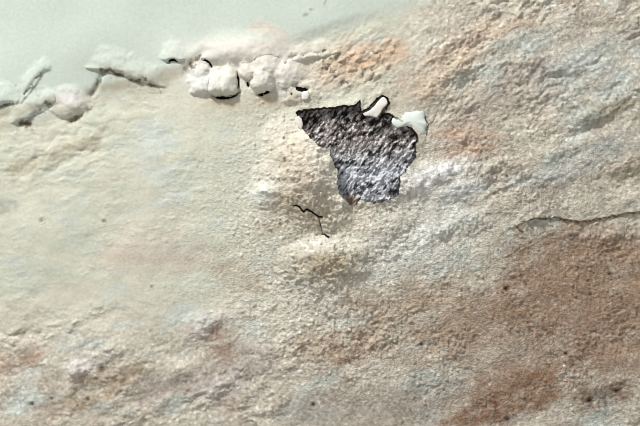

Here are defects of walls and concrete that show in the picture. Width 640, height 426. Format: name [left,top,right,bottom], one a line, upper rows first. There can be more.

spalling [295,95,427,206]
crack [293,205,329,238]
crack [516,211,640,232]